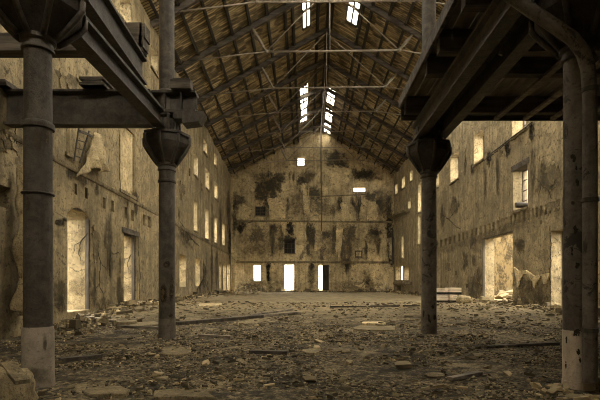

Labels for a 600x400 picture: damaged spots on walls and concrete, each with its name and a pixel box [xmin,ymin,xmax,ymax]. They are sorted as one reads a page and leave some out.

crack [94,237,141,299]
water stain [245,171,342,255]
water stain [300,189,394,275]
flaking render [513,267,550,288]